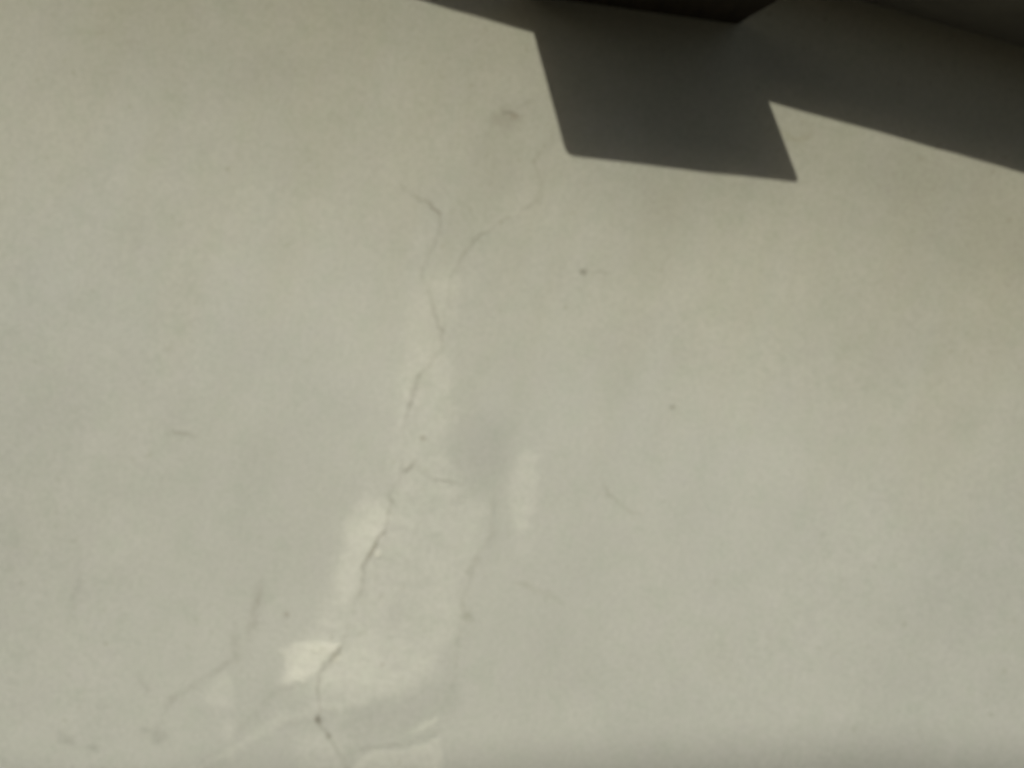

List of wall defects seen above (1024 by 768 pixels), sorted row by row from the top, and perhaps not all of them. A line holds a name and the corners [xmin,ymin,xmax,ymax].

peeling [277,639,340,685]
crack [311,123,561,768]